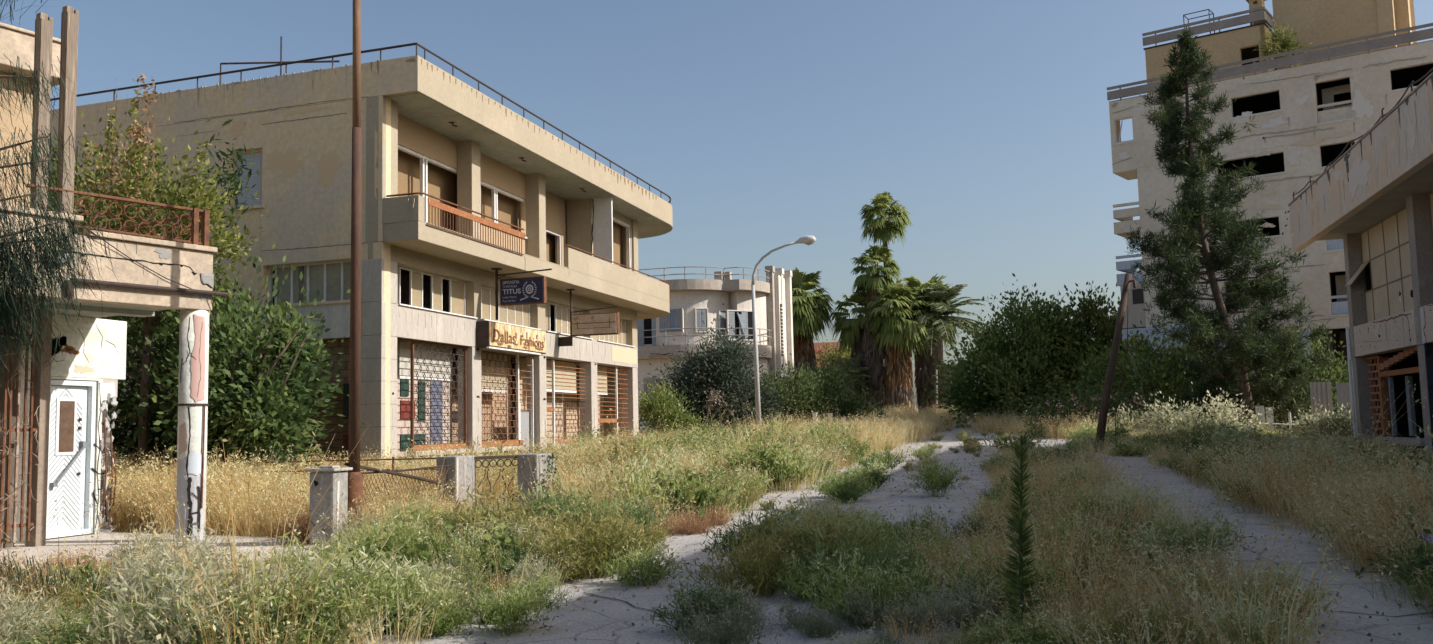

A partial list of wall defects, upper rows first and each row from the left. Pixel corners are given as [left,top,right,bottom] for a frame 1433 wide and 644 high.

crack [75,251,214,288]
peeling [190,314,206,402]
crack [180,317,202,538]